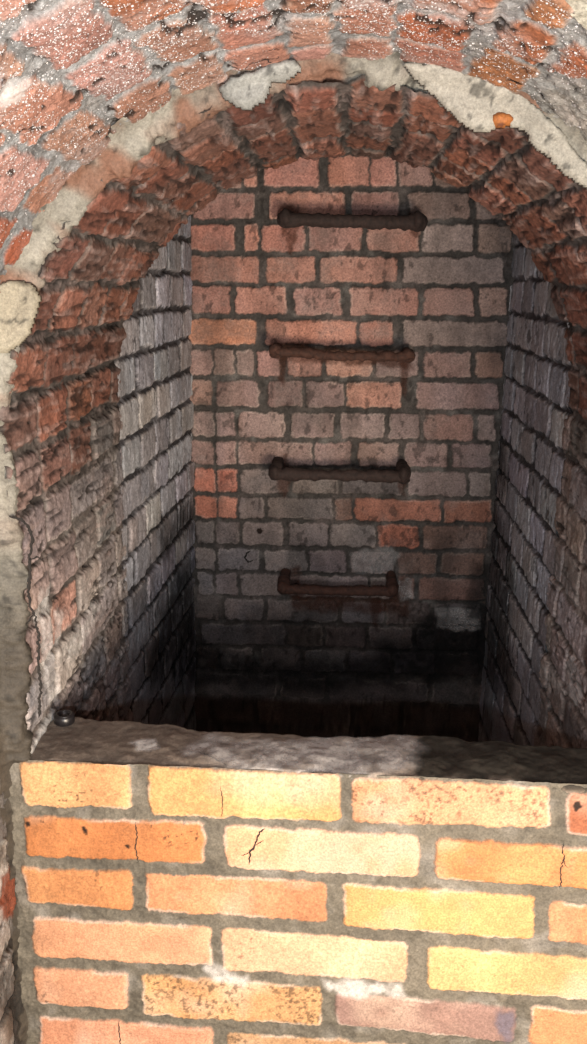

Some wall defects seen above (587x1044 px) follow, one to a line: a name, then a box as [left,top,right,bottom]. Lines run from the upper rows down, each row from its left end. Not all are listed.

peeling [0,281,42,353]
crack [242,829,264,865]
crack [559,843,568,887]